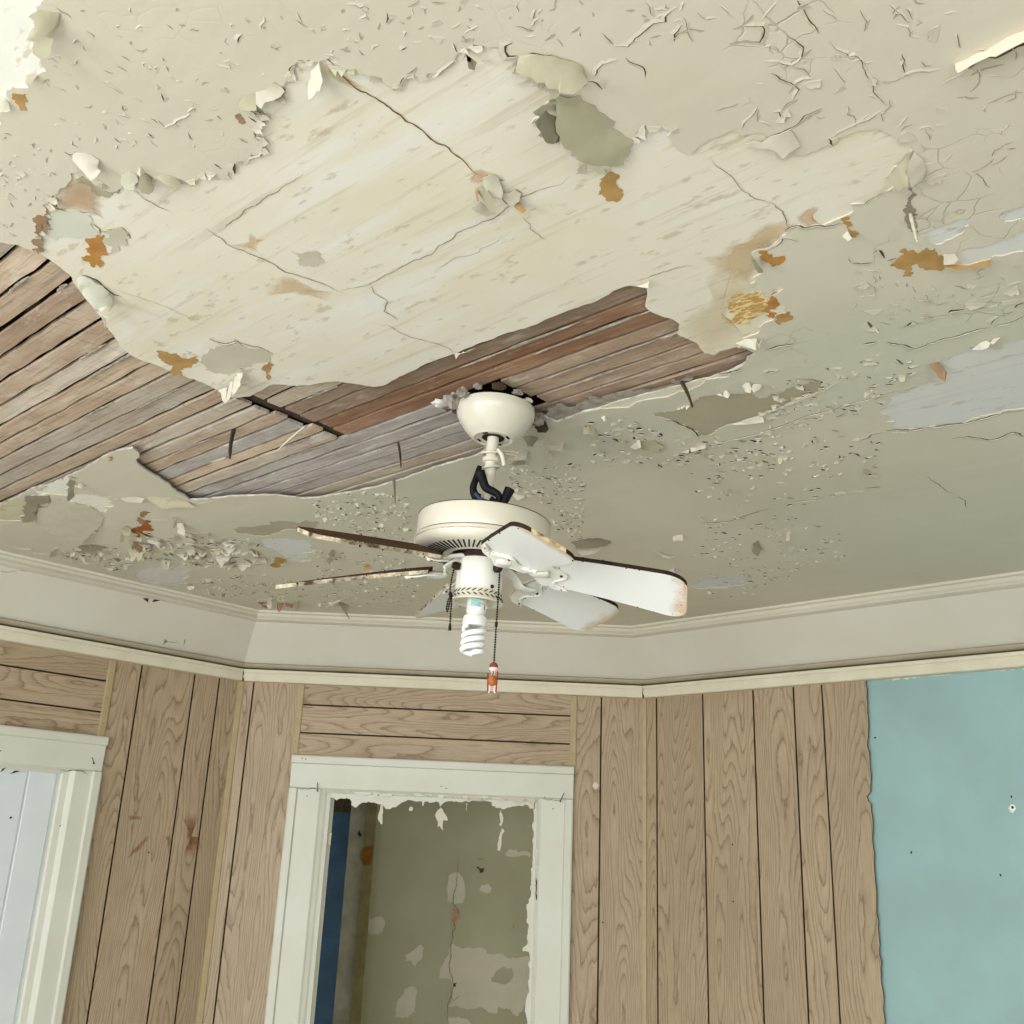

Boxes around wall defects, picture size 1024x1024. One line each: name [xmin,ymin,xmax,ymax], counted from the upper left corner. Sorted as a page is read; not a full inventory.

crack [63,76,192,157]
crack [205,2,565,352]
flaking render [0,0,1024,403]
crack [582,6,682,90]
crack [713,162,892,250]
crack [741,1,889,146]
crack [899,54,938,79]
flaking render [509,337,1024,600]
flaking render [0,475,422,619]
peeling [331,790,538,1024]
crack [447,867,459,1017]